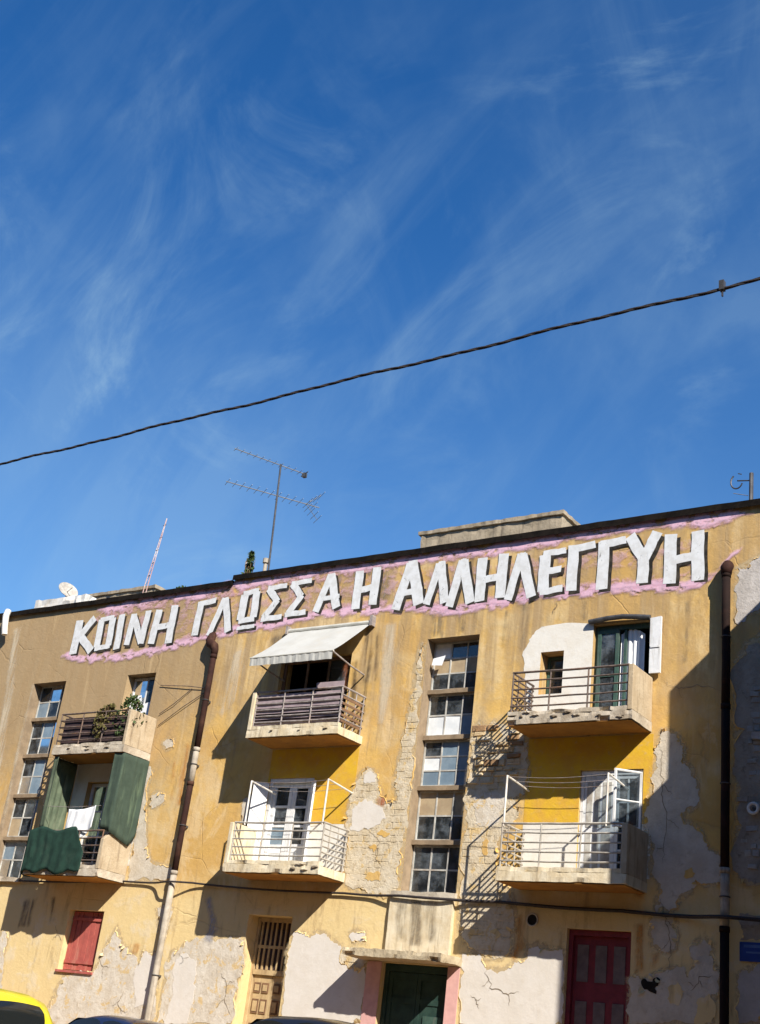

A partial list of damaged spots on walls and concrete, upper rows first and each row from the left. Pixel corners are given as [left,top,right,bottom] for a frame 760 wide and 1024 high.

peeling [733,554,760,626]
peeling [128,766,177,882]
peeling [161,737,175,750]
peeling [343,642,427,900]
spalling [457,720,531,961]
peeling [626,633,760,1024]
peeling [48,904,247,1024]